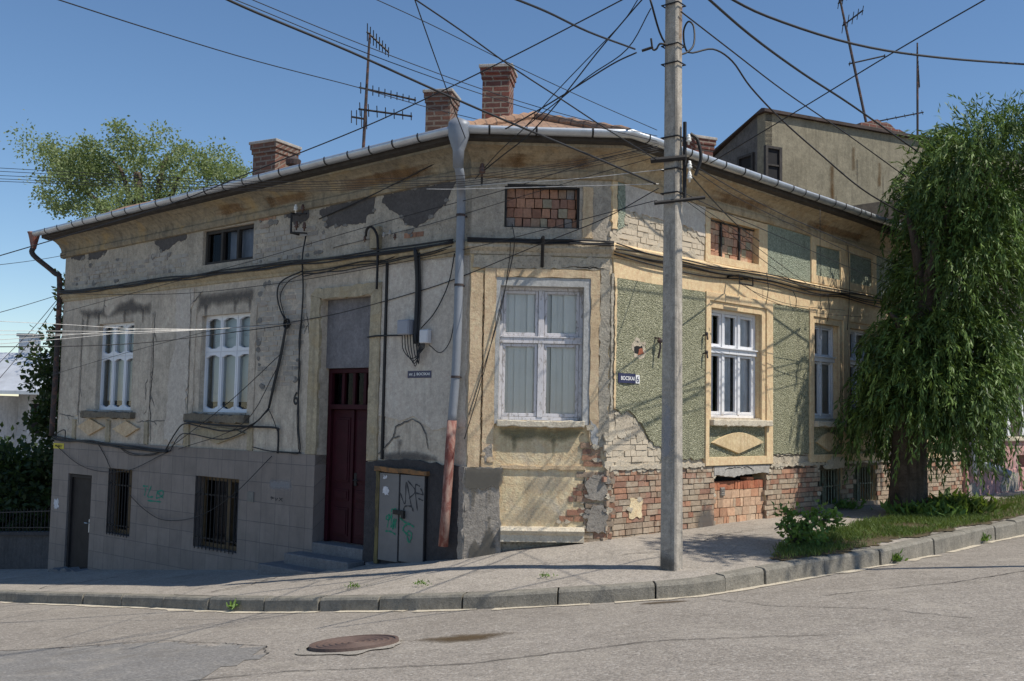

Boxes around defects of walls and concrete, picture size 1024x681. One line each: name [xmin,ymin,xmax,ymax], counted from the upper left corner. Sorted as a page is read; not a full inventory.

flaking render [154,234,187,253]
flaking render [253,181,456,264]
flaking render [608,210,663,253]
flaking render [682,225,705,261]
water stain [83,301,149,320]
water stain [199,290,252,312]
flaking render [556,411,661,542]
flaking render [682,466,716,529]